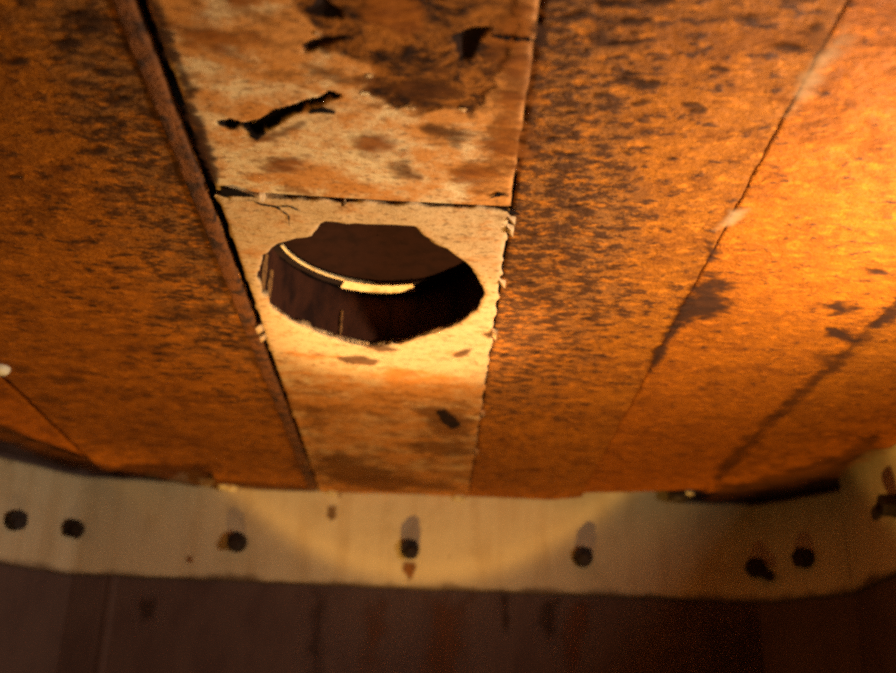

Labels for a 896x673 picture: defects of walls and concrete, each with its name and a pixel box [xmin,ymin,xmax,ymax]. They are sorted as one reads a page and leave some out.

peeling [295,0,520,114]
crack [217,90,341,141]
rust [452,3,535,194]
rust [261,159,303,173]
rust [355,137,396,153]
rust [261,253,273,299]
damp [649,287,697,373]
rust [337,346,397,366]
damp [714,298,896,482]
rust [117,465,315,492]
rust [710,432,883,502]